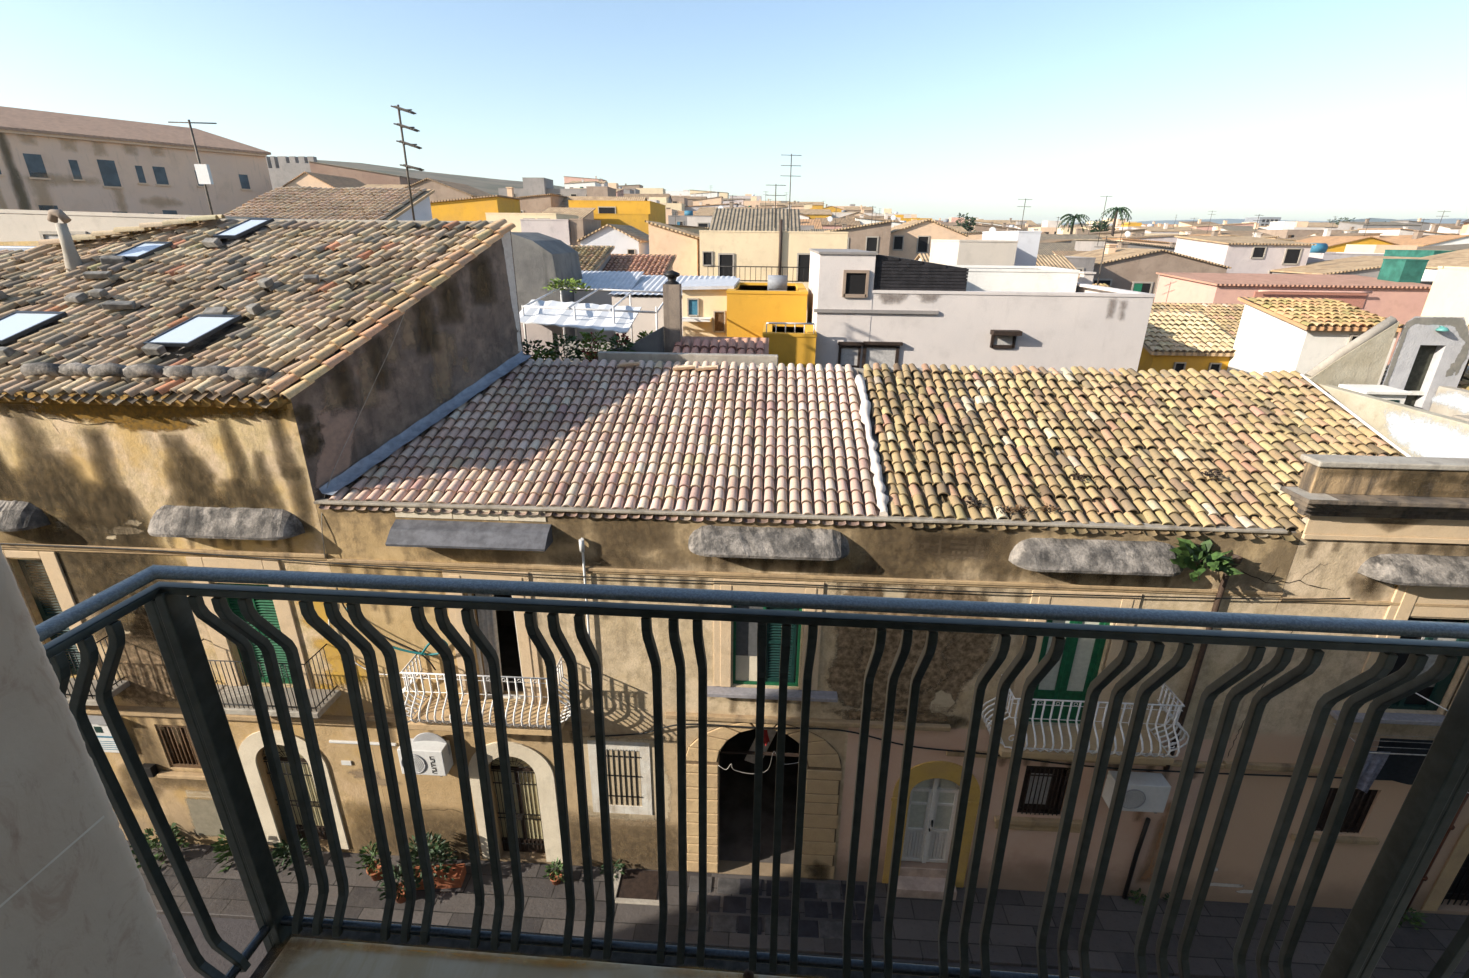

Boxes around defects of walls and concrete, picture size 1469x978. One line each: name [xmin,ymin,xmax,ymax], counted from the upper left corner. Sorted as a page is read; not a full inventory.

damp [165,260,492,545]
damp [0,413,208,804]
peeling [827,585,998,723]